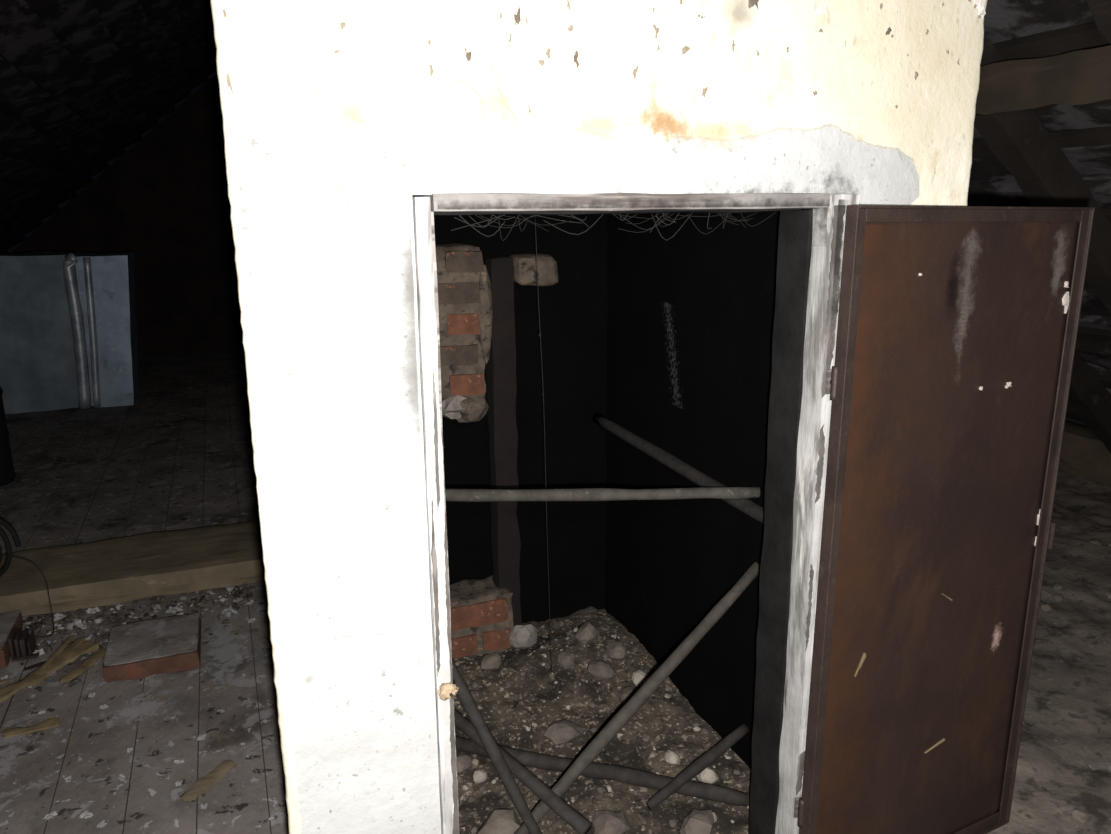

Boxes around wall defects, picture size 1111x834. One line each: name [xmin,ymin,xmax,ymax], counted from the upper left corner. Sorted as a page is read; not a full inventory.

spalling [968,0,986,19]
leakage [644,111,684,134]